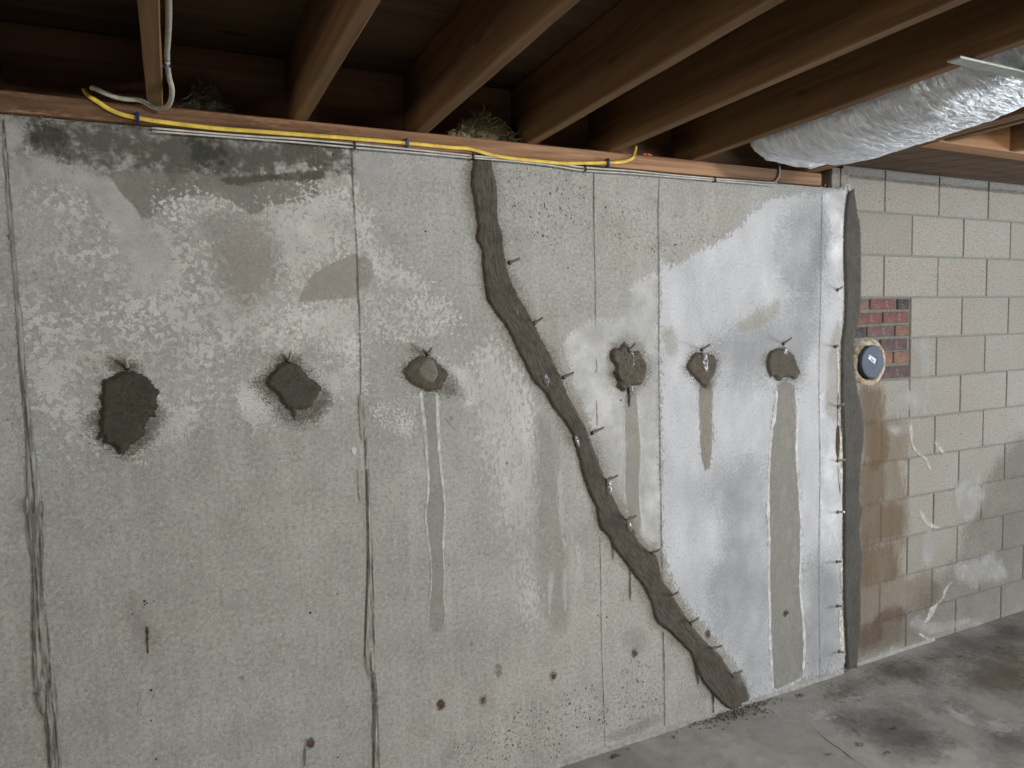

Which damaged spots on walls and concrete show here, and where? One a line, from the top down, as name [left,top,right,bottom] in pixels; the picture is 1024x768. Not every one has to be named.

crack [25,391,60,768]
leakage [0,91,584,648]
crack [357,469,380,768]
crack [590,174,598,320]
crack [660,632,668,722]
leakage [563,184,851,701]